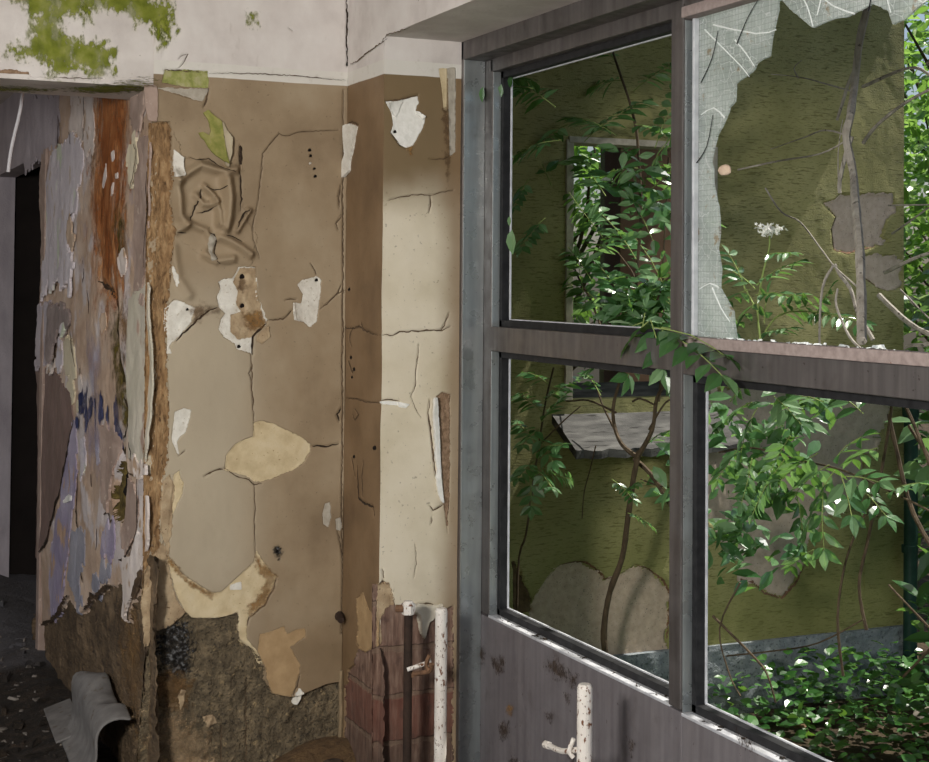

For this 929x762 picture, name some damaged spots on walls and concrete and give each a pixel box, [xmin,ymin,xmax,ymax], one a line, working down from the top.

leakage [155,18,169,50]
rust [87,98,131,322]
spalling [23,67,456,762]
crack [221,0,452,633]
spalling [824,192,903,291]
spalling [511,561,669,655]